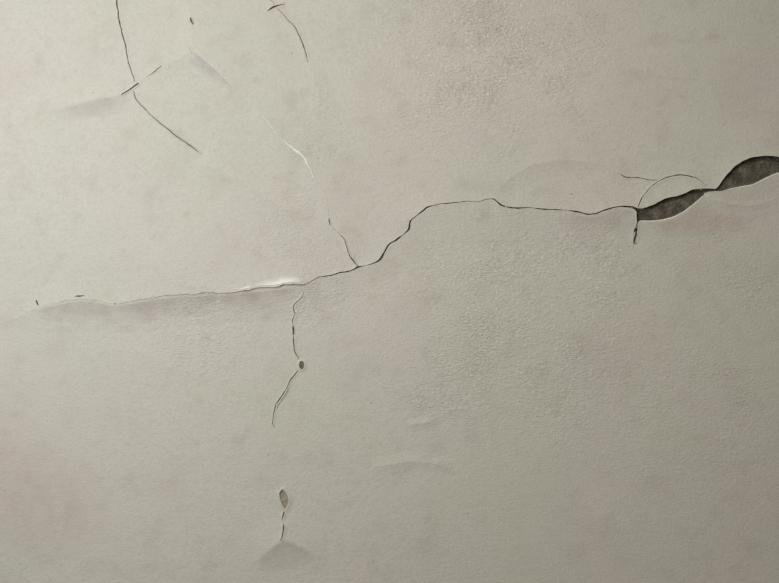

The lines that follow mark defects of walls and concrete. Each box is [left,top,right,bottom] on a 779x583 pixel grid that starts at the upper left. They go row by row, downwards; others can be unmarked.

crack [112,0,162,98]
crack [266,0,286,14]
peeling [6,86,779,333]
crack [637,172,706,209]
crack [270,292,308,428]